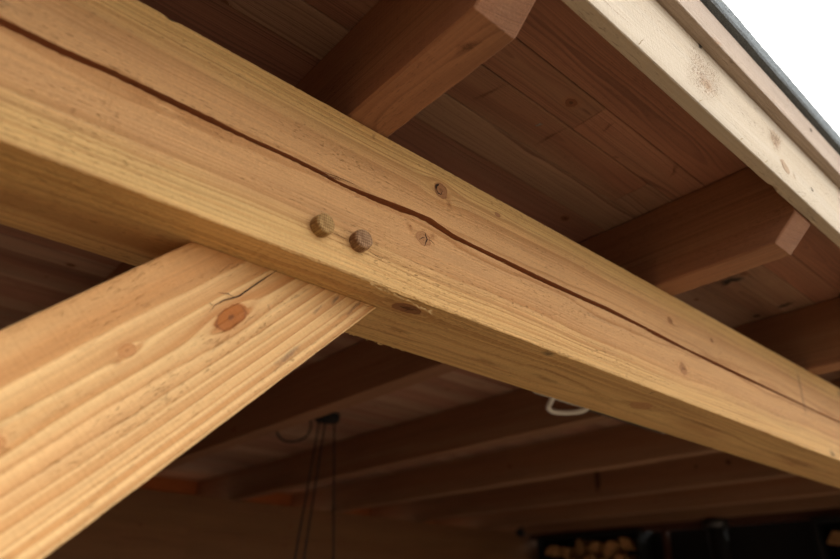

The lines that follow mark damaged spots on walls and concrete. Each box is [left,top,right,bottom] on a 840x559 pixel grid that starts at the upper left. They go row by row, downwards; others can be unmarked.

crack [0,18,840,423]